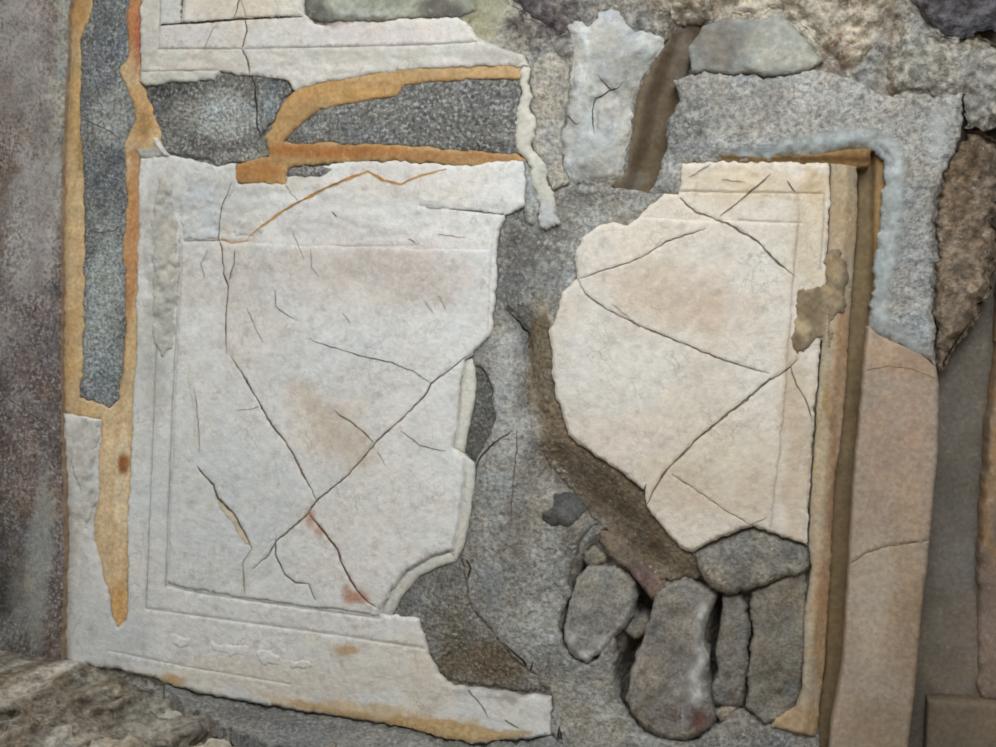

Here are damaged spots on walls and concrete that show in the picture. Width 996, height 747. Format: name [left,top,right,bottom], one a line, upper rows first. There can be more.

crack [427,207,504,215]
crack [577,164,813,525]
crack [184,169,468,606]
rust [119,457,128,472]
spalling [382,358,547,692]
spalling [542,492,587,527]
crack [852,540,927,562]